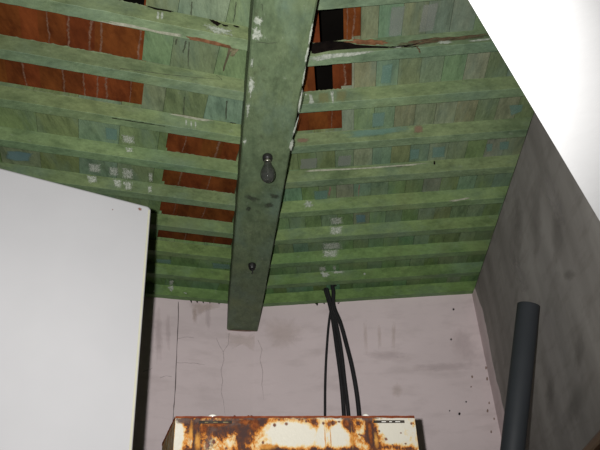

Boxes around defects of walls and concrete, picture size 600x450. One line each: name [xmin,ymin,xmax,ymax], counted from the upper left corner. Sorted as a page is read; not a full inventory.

peeling [0,2,182,61]
crack [389,33,488,53]
peeling [0,59,144,108]
peeling [289,7,490,149]
peeling [166,133,246,162]
peeling [161,169,237,196]
peeling [160,202,234,223]
peeling [157,230,232,248]